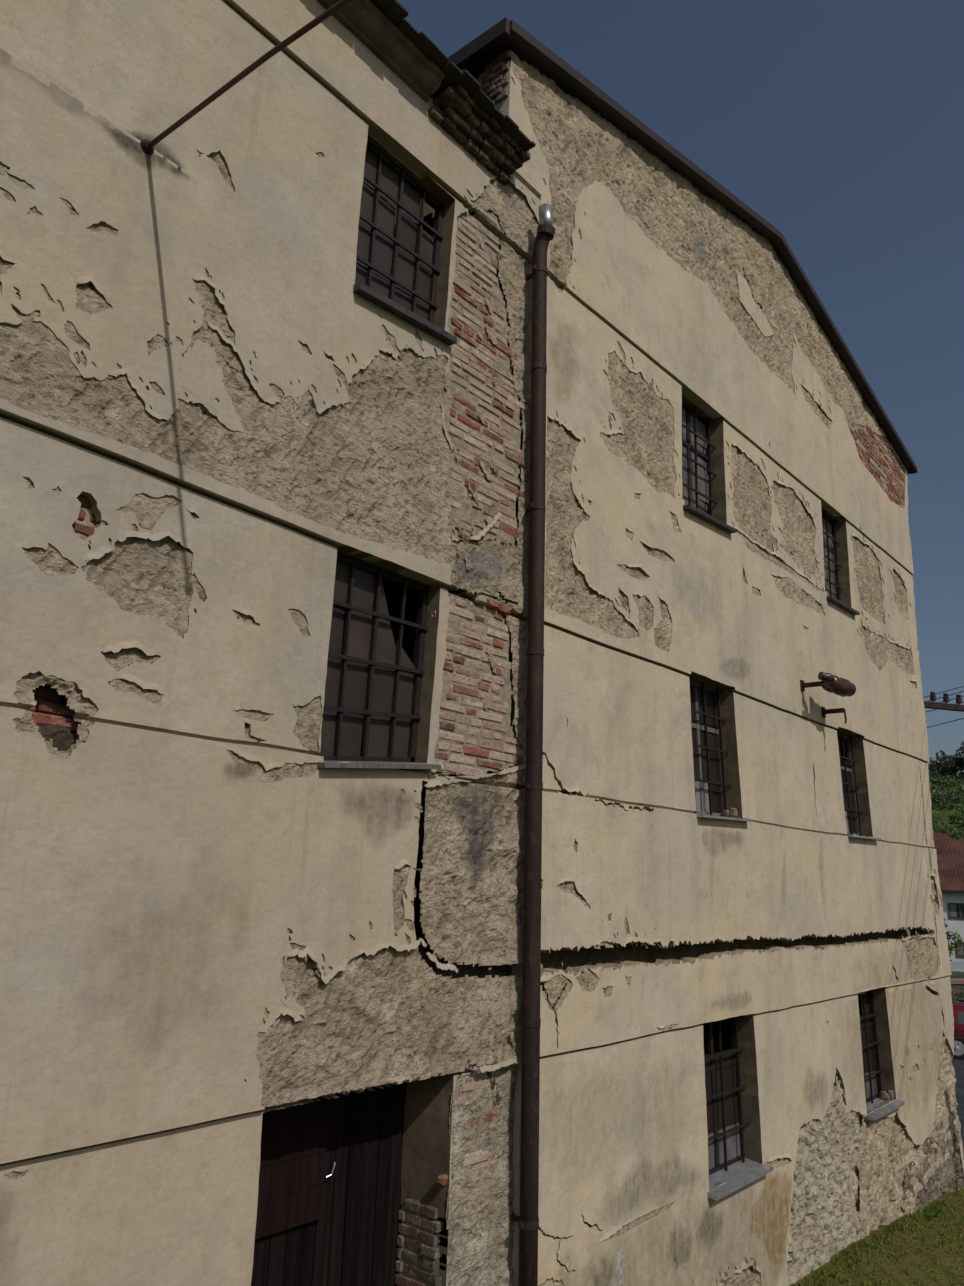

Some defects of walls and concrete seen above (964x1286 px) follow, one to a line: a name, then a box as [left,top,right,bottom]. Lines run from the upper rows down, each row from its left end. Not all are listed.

peeling [476,50,905,532]
peeling [0,82,539,1286]
peeling [545,413,674,652]
peeling [726,442,825,616]
peeling [852,528,917,688]
crack [559,787,649,811]
peeling [541,876,590,909]
peeling [540,962,631,1011]
flaking render [594,914,665,949]
crack [415,928,924,1010]
flaking render [765,1033,964,1286]
crack [538,1222,595,1281]